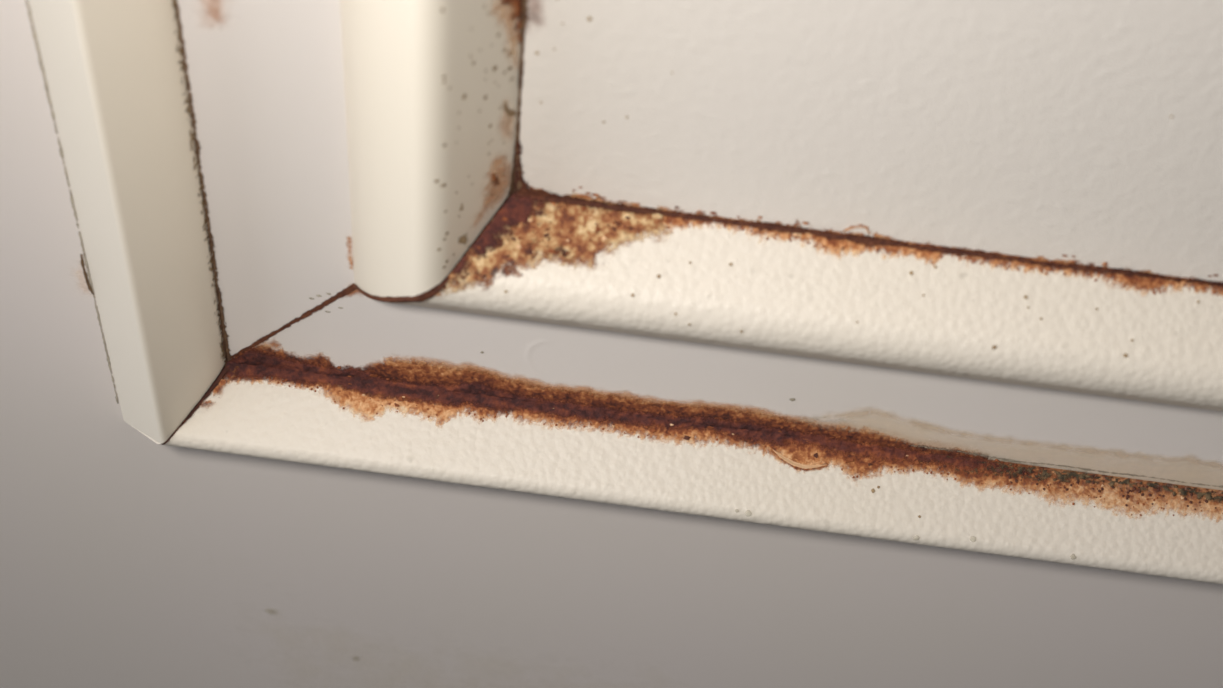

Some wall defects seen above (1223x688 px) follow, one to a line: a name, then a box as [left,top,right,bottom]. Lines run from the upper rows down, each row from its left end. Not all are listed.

corrosion [438,103,1223,303]
corrosion [222,345,1223,521]